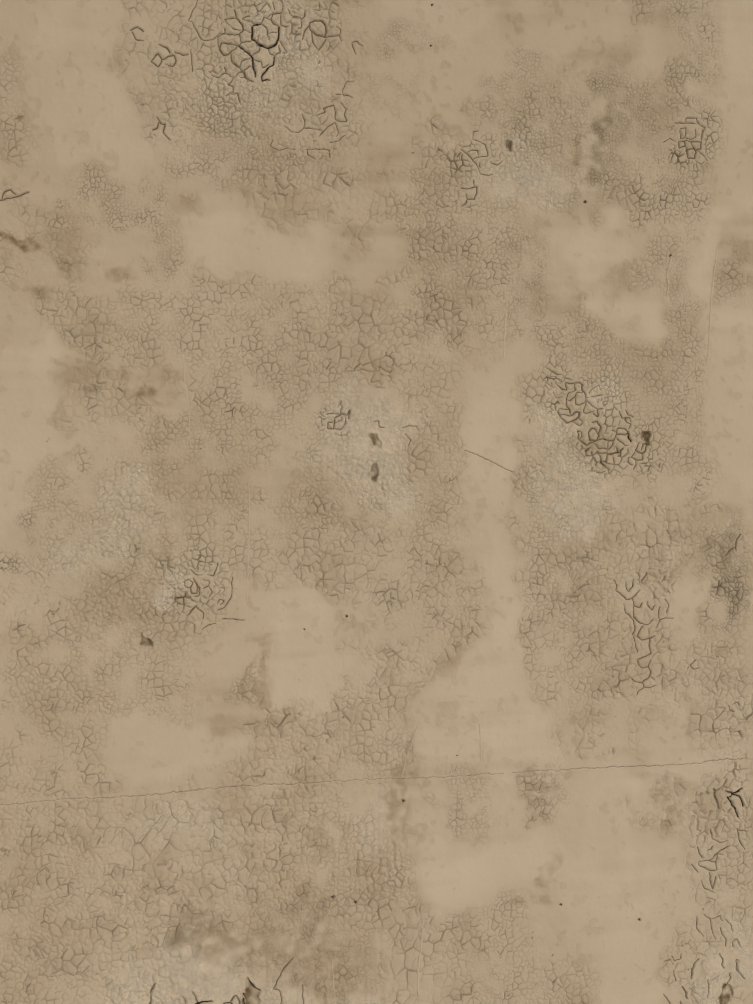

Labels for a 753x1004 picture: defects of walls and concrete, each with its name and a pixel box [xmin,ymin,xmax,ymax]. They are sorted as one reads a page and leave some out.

crack [130,0,363,102]
crack [270,81,353,157]
crack [663,118,706,159]
crack [327,401,350,430]
crack [553,382,647,473]
crack [184,563,242,629]
crack [615,583,673,694]
crack [691,788,745,892]
crack [183,958,304,1004]
crack [663,916,745,1003]